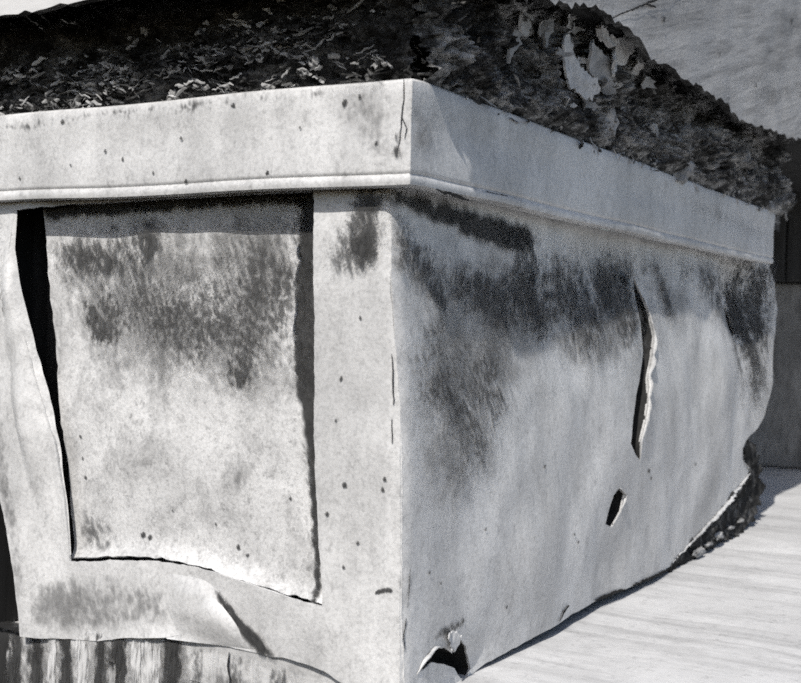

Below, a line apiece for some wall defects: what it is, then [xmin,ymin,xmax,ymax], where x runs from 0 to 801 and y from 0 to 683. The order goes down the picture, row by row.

crack [397,76,407,152]
peeling [506,10,657,111]
water stain [44,193,322,604]
water stain [330,188,384,272]
water stain [419,326,506,464]
water stain [395,191,673,356]
water stain [701,260,776,405]
water stain [0,621,181,683]